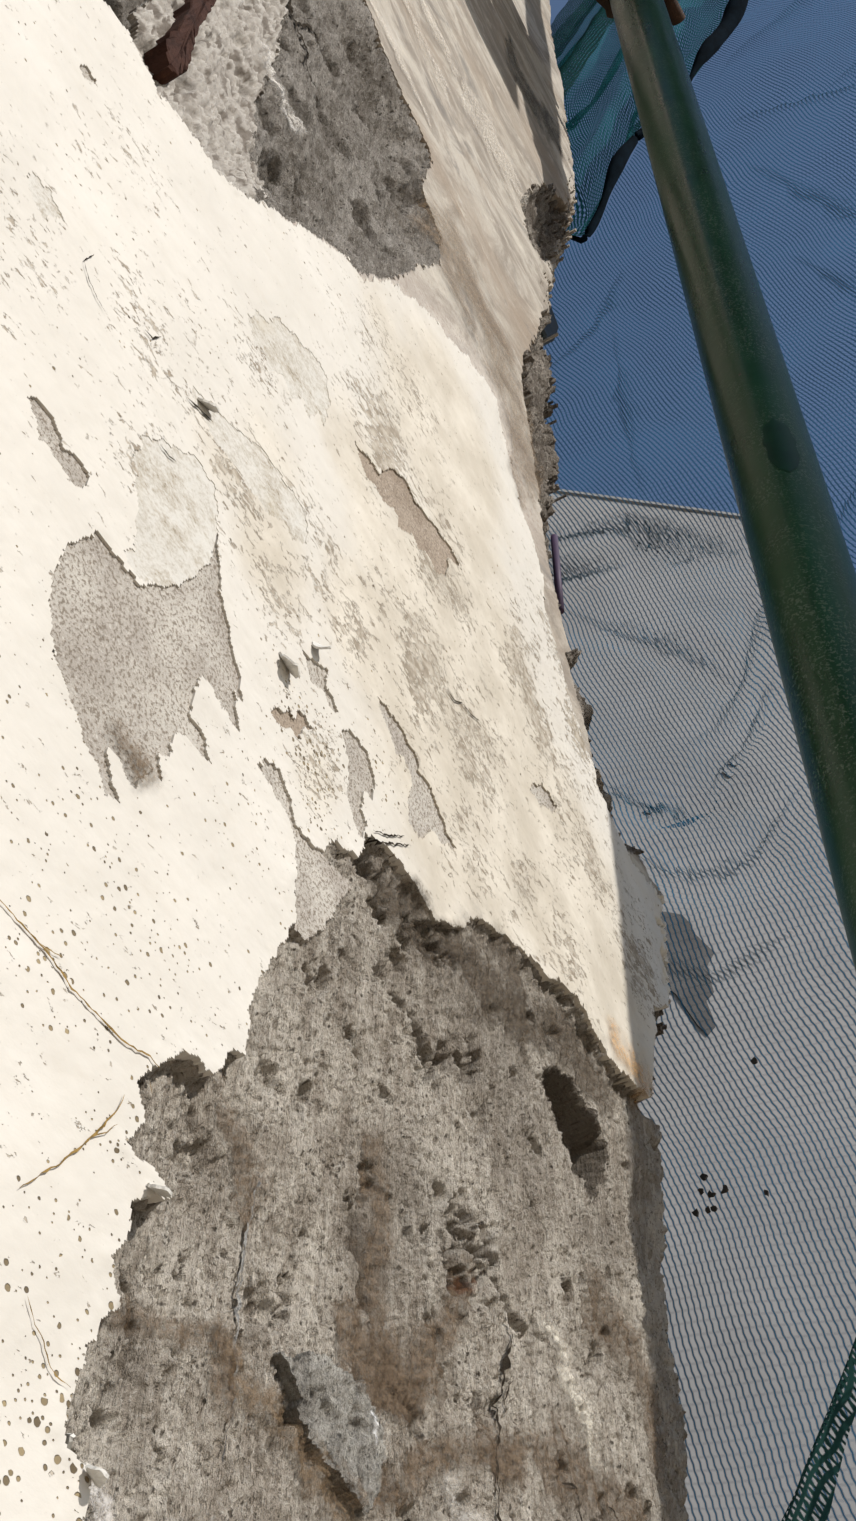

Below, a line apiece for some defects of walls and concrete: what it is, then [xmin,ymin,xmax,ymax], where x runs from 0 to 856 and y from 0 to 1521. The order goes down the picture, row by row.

spalling [103,0,441,279]
peeling [192,387,308,544]
peeling [357,449,457,575]
peeling [49,436,240,799]
peeling [272,709,310,737]
peeling [278,641,336,712]
peeling [379,702,454,848]
spalling [565,648,644,857]
crack [0,900,159,1188]
spalling [64,731,689,1521]
crack [491,1315,513,1521]